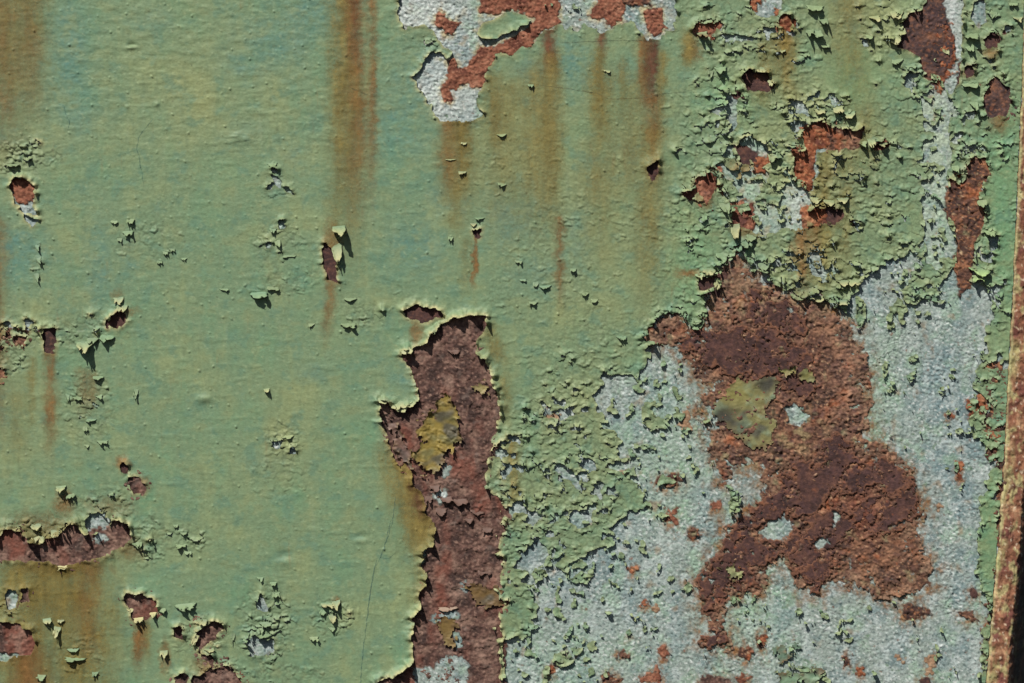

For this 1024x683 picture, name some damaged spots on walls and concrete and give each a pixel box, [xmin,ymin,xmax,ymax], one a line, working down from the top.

corrosion [333,0,376,169]
corrosion [639,38,665,149]
peeling [0,137,48,282]
peeling [314,225,357,302]
peeling [369,0,1023,683]
corrosion [958,32,1024,683]
corrosion [638,218,944,683]
peeling [0,485,203,577]
peeling [0,584,65,669]
peeling [64,648,86,663]
peeling [112,577,294,683]